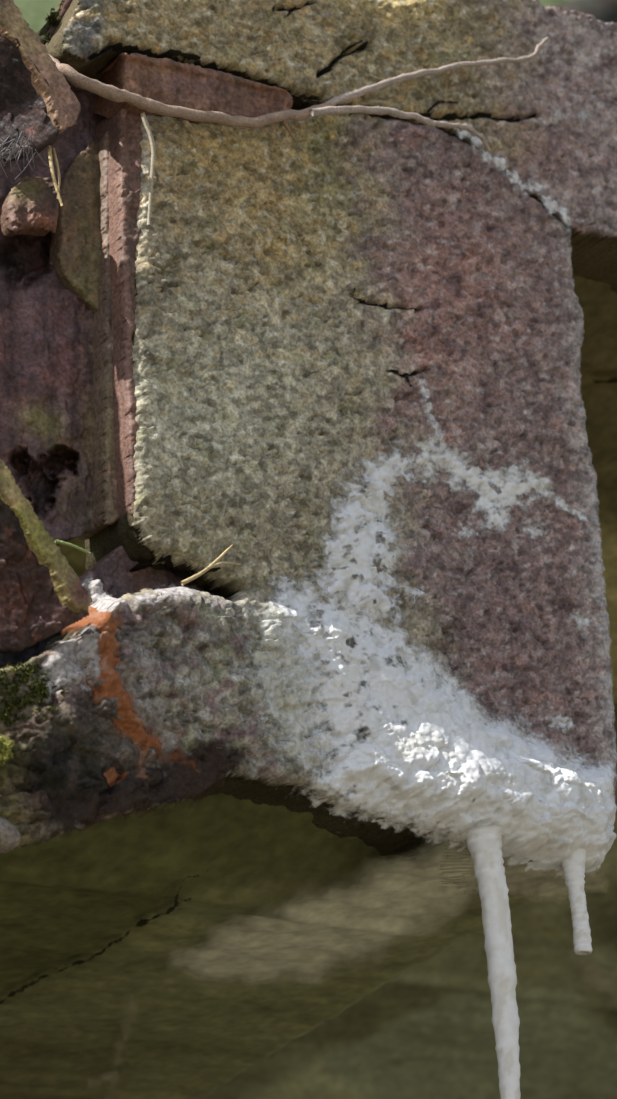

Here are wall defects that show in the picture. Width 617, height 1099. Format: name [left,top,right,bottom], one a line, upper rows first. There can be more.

crack [88,40,368,105]
crack [353,287,419,311]
crack [387,369,429,387]
rust [65,606,199,787]
water stain [173,380,617,981]
crack [0,875,199,1004]